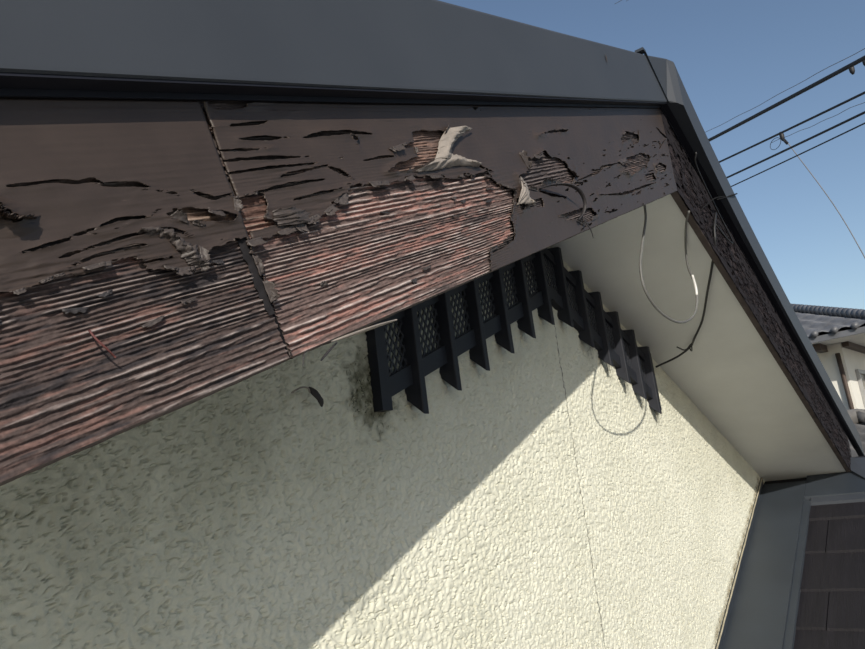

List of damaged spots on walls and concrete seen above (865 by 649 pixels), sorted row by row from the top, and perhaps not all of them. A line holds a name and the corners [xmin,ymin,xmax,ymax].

peeling [0,123,850,483]